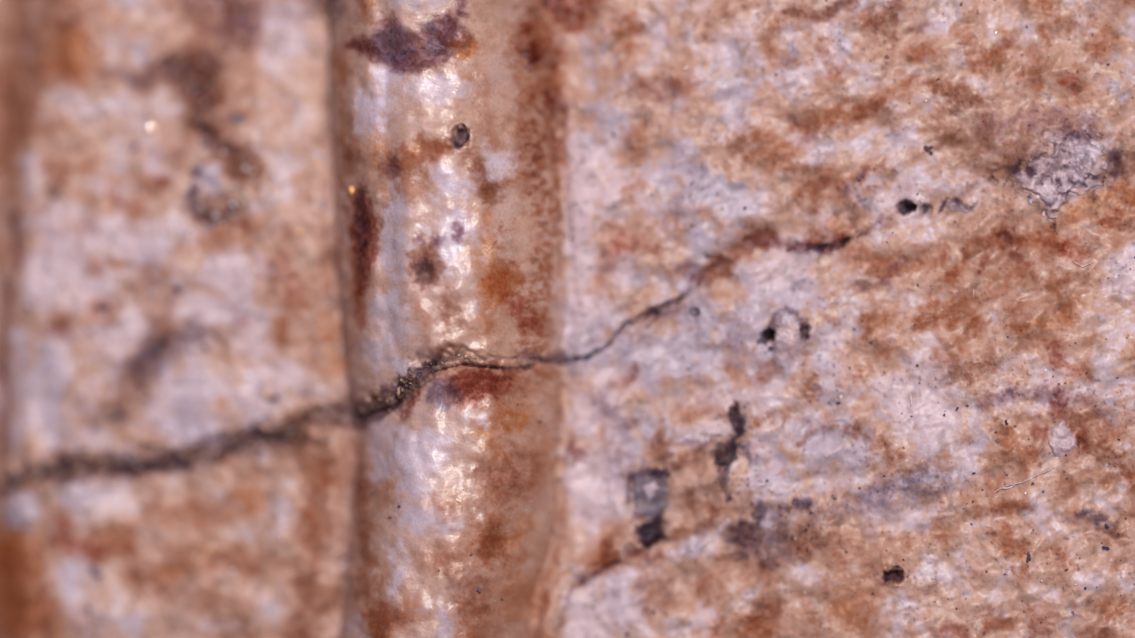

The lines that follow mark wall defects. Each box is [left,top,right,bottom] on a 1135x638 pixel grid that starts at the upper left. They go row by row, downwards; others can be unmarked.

crack [808,234,867,251]
crack [556,297,682,364]
crack [0,352,477,492]